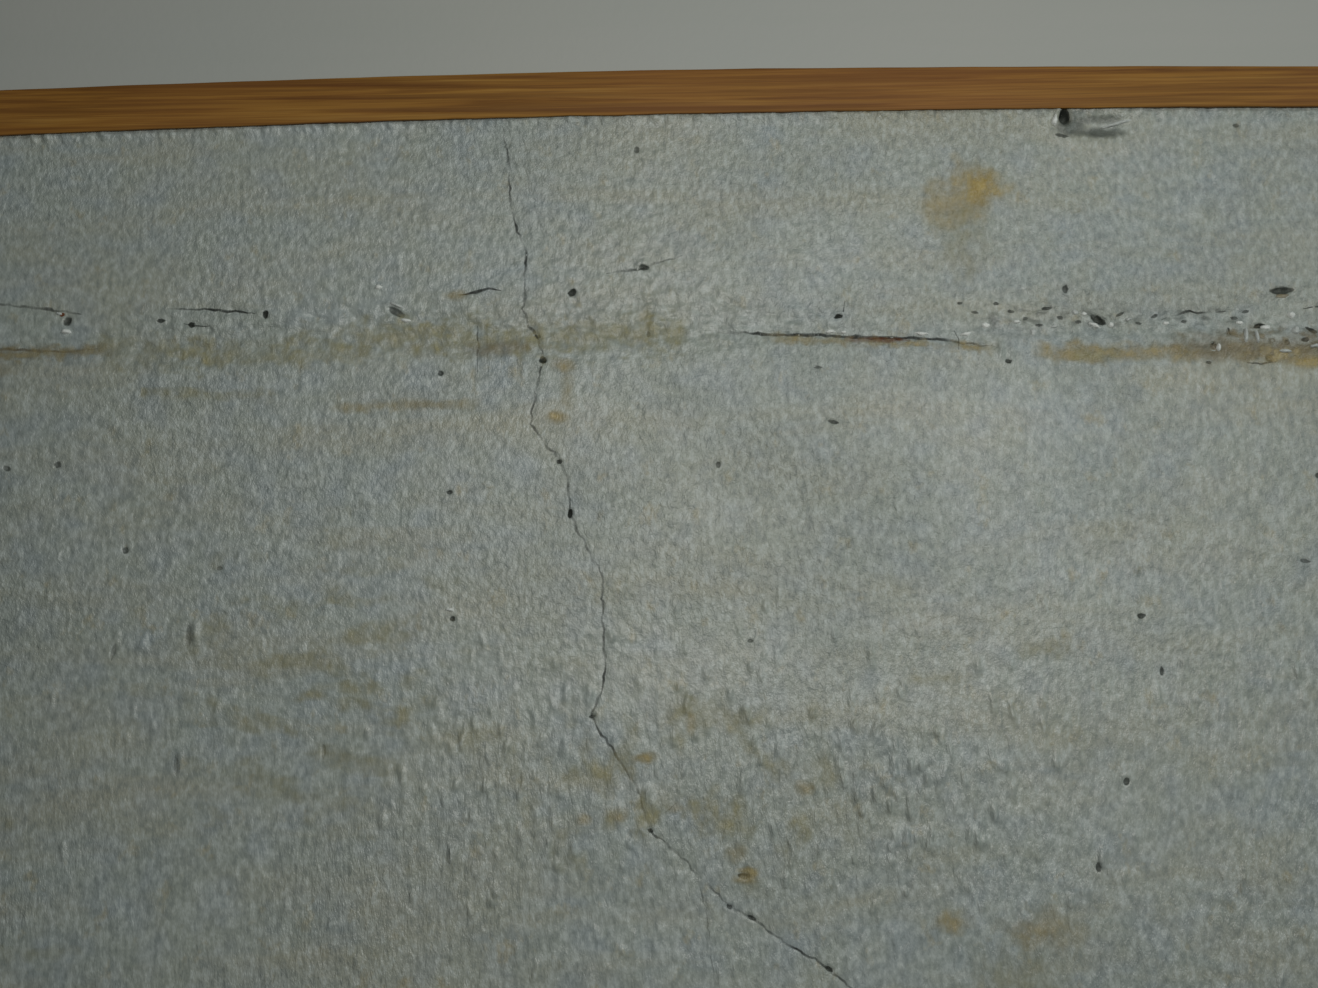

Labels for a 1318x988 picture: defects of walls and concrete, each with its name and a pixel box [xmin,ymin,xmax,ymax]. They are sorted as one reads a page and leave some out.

crack [531,328,547,370]
crack [751,303,990,349]